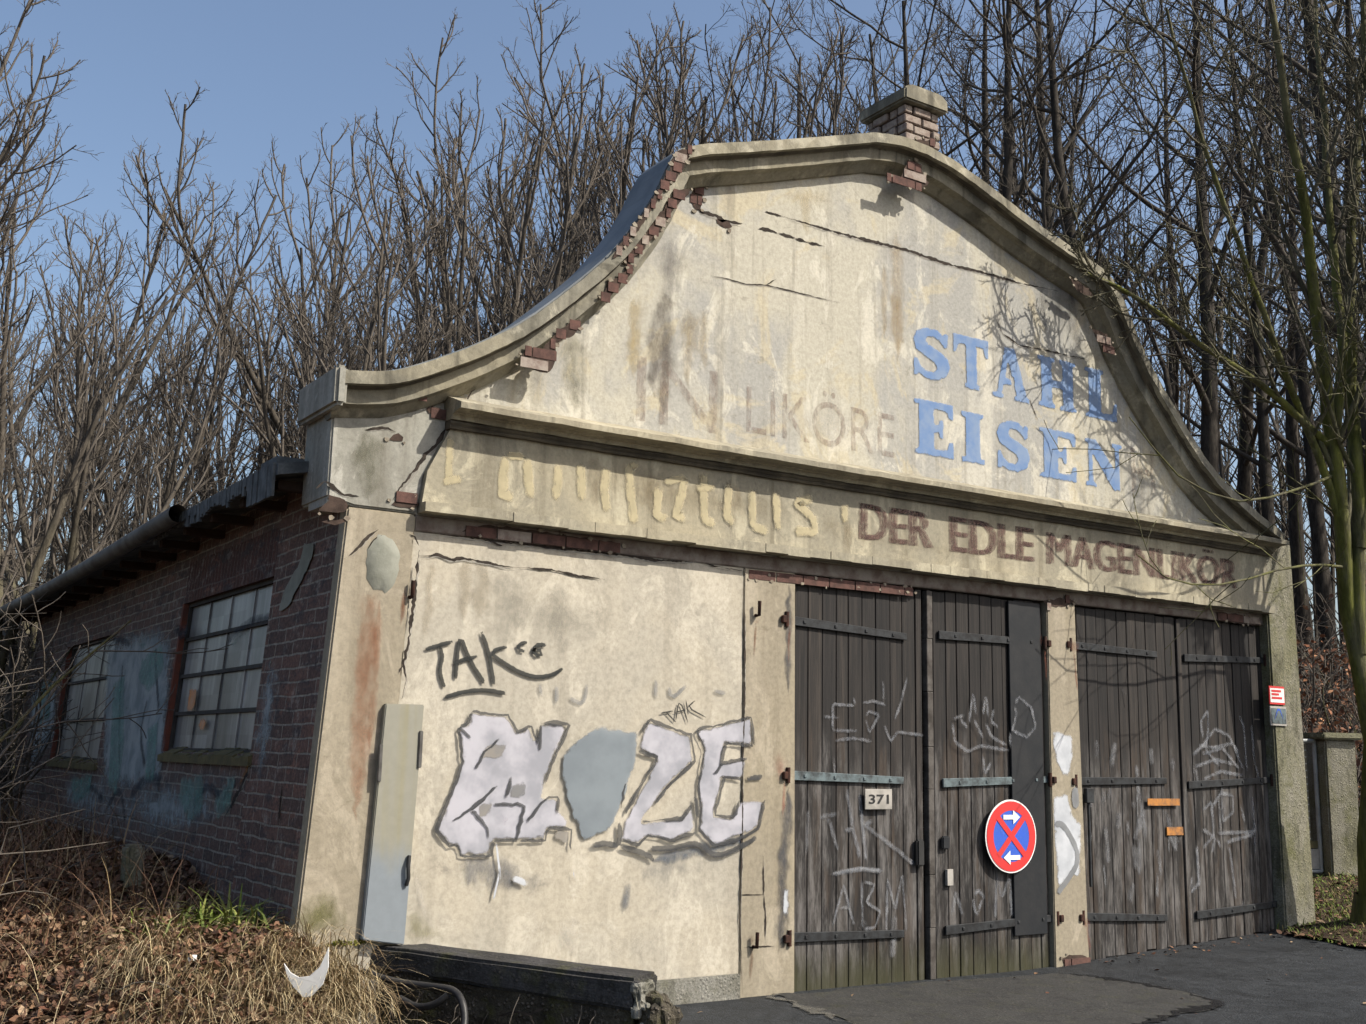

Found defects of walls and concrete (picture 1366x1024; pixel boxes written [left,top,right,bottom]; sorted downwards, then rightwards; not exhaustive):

spalling [598,145,732,303]
crack [698,209,1056,292]
crack [714,276,840,304]
spalling [515,319,584,373]
crack [996,320,1087,360]
crack [366,425,395,433]
crack [316,481,359,498]
crack [394,429,448,498]
crack [350,529,771,992]